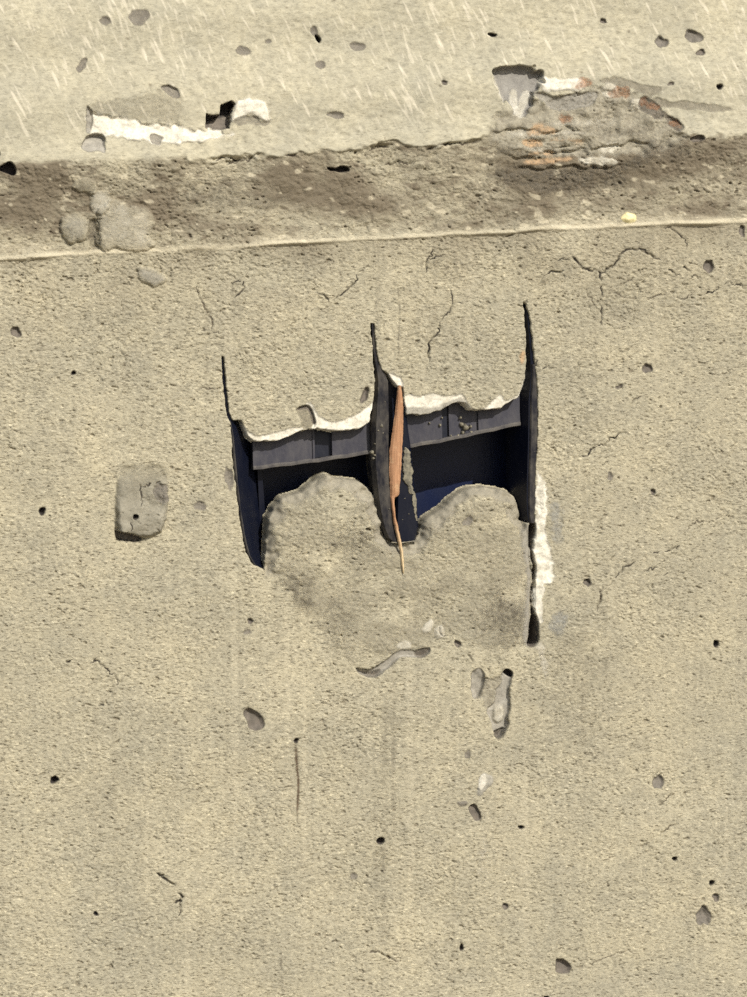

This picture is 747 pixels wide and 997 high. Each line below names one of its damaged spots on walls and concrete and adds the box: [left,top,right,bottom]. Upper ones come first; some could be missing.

spalling [81,107,235,153]
spalling [490,66,730,167]
crack [547,226,741,324]
spalling [386,373,525,416]
spalling [238,402,373,442]
spalling [531,474,555,623]
peeling [422,620,444,638]
spalling [356,641,430,677]
spalling [471,668,512,738]